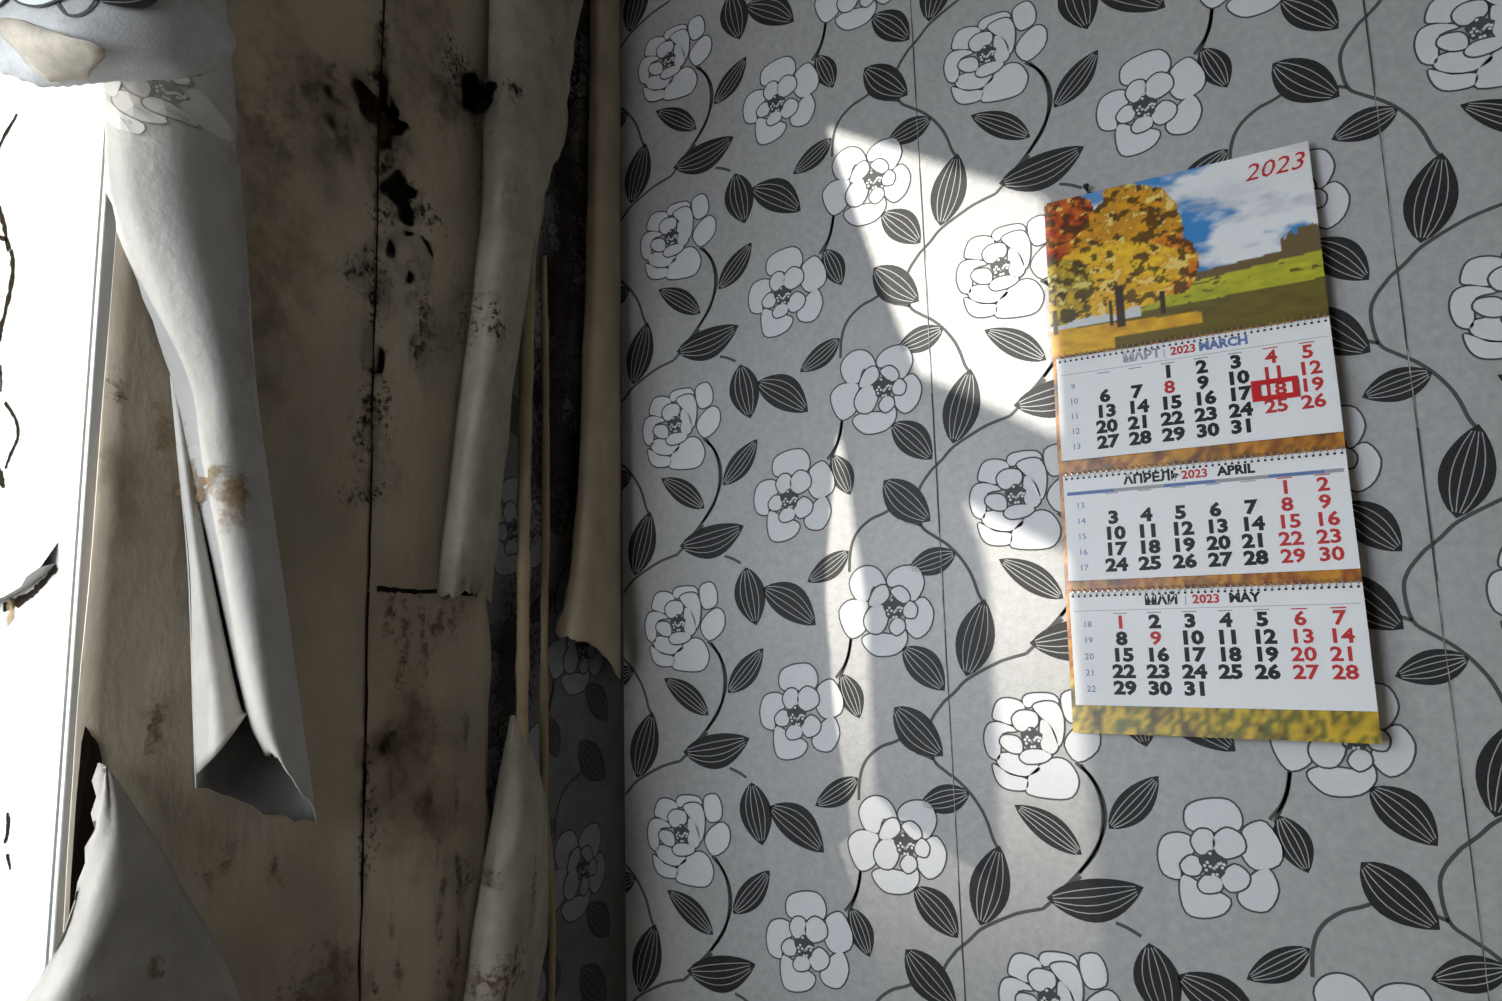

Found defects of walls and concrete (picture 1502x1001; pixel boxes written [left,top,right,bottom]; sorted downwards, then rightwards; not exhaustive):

damp [457,295,505,346]
damp [531,1,590,560]
damp [338,380,392,503]
peeling [0,542,58,625]
damp [488,546,541,788]
crack [2,813,10,870]